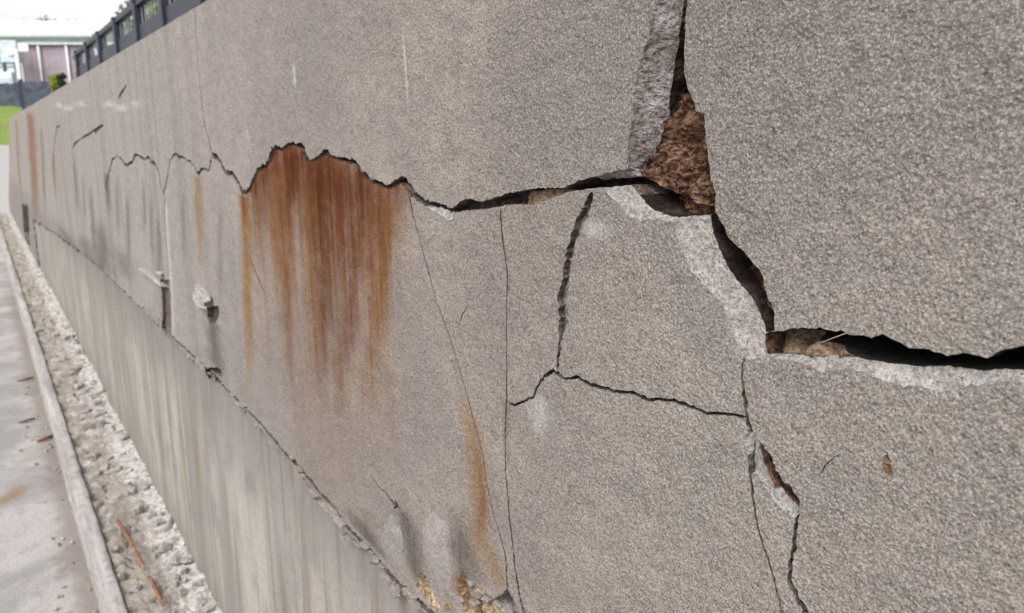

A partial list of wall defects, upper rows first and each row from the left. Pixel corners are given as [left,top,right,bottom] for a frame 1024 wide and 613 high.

crack [53,124,103,166]
spalling [590,0,1024,395]
crack [640,0,1024,371]
peeling [192,285,219,323]
crack [106,115,676,613]
spalling [351,540,520,613]
crack [500,192,753,613]
spalling [744,427,800,518]
crack [748,439,808,613]